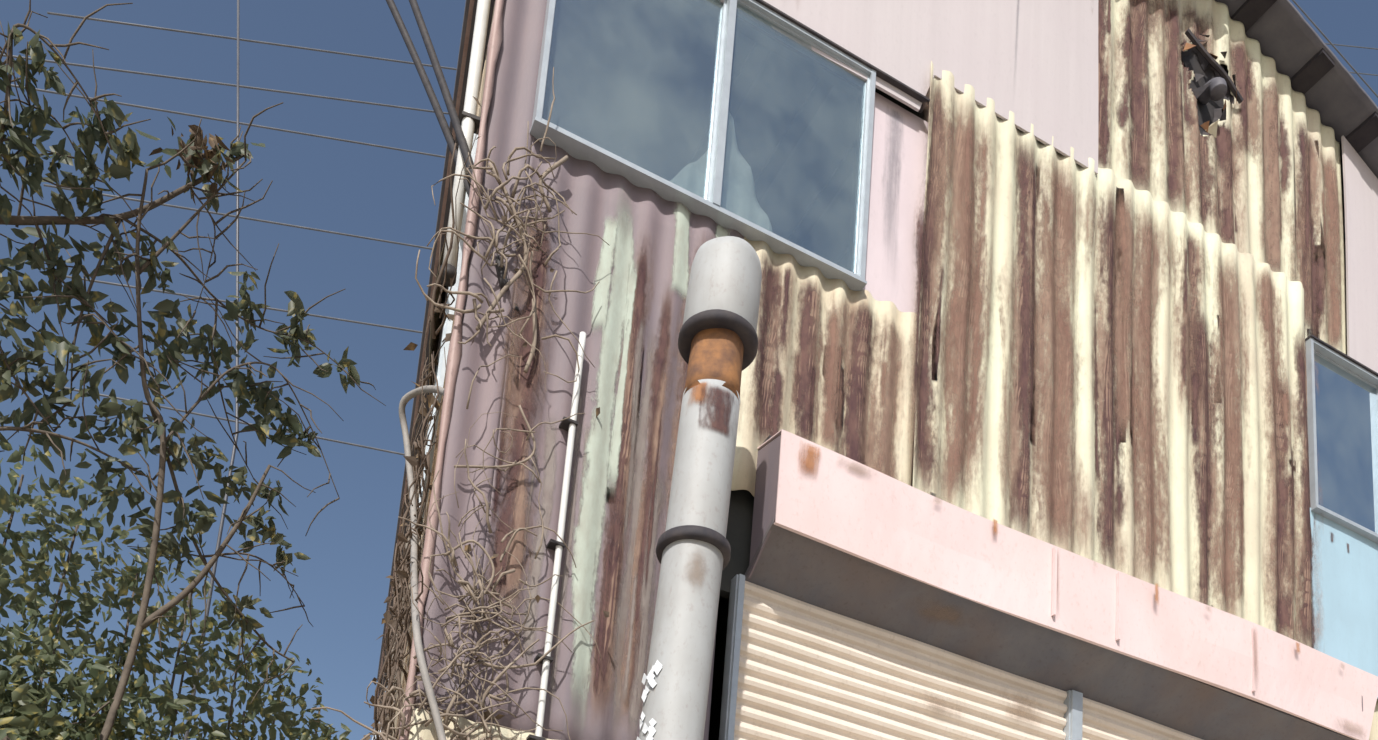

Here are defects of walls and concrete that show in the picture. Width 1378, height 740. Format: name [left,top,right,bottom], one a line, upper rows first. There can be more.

corrosion [590,254,734,707]
corrosion [755,96,992,495]
corrosion [993,0,1342,652]
peeling [1183,34,1227,60]
peeling [1200,74,1237,138]